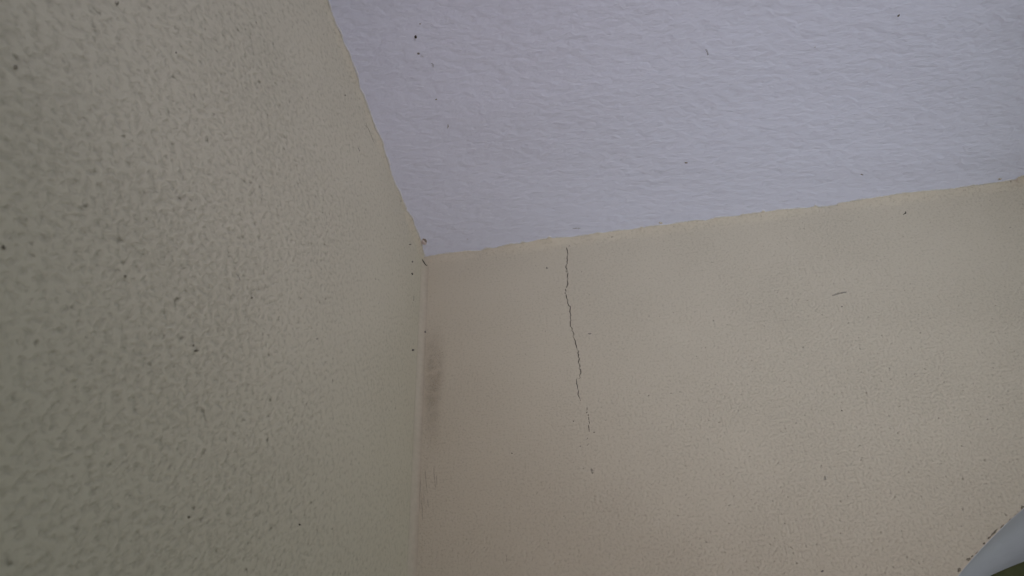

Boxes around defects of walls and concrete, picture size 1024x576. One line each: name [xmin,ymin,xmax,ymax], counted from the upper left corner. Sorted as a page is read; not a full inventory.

crack [565,248,590,439]